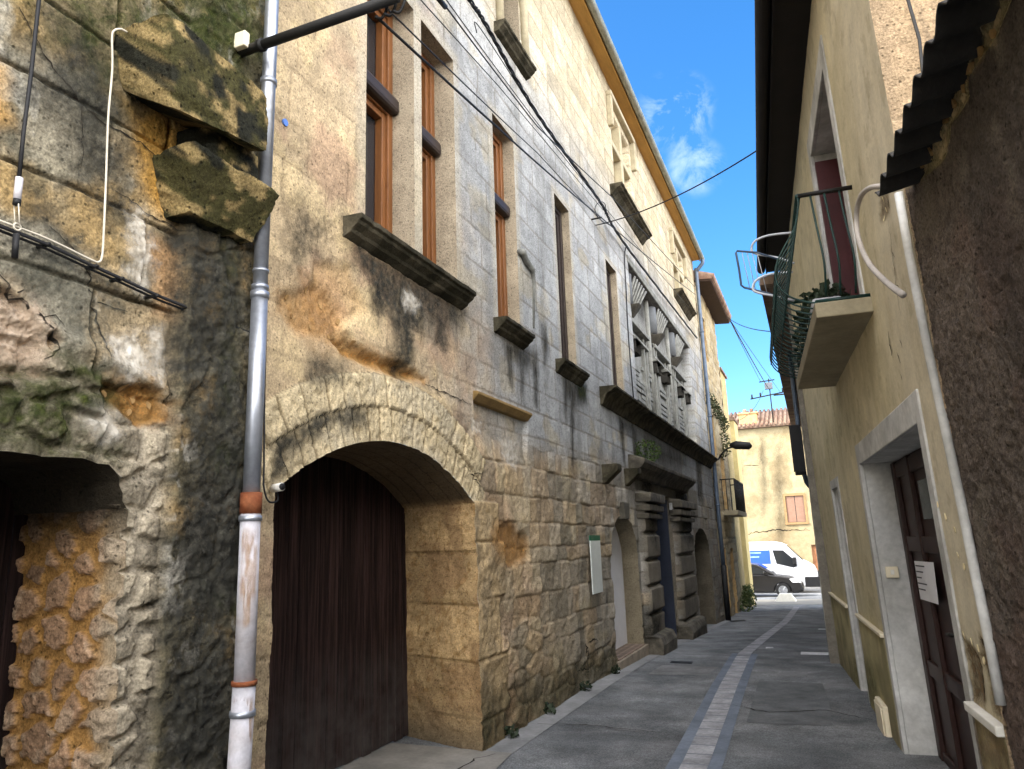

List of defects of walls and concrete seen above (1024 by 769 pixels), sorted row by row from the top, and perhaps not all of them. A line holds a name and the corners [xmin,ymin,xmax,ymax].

peeling [127,210,150,287]
crack [0,275,62,359]
crack [52,228,128,357]
leakage [358,246,462,371]
peeling [111,332,165,380]
spalling [338,340,410,378]
leakage [507,329,547,404]
spalling [80,384,166,441]
leakage [565,379,586,451]